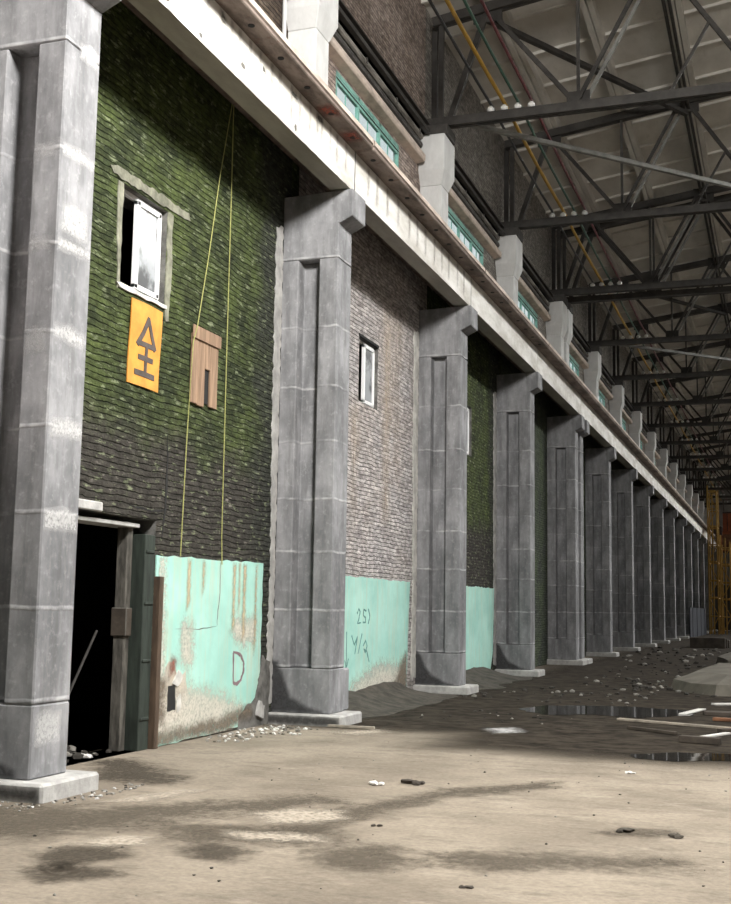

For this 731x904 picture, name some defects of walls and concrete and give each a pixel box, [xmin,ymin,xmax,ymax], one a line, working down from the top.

peeling [158,226,284,737]